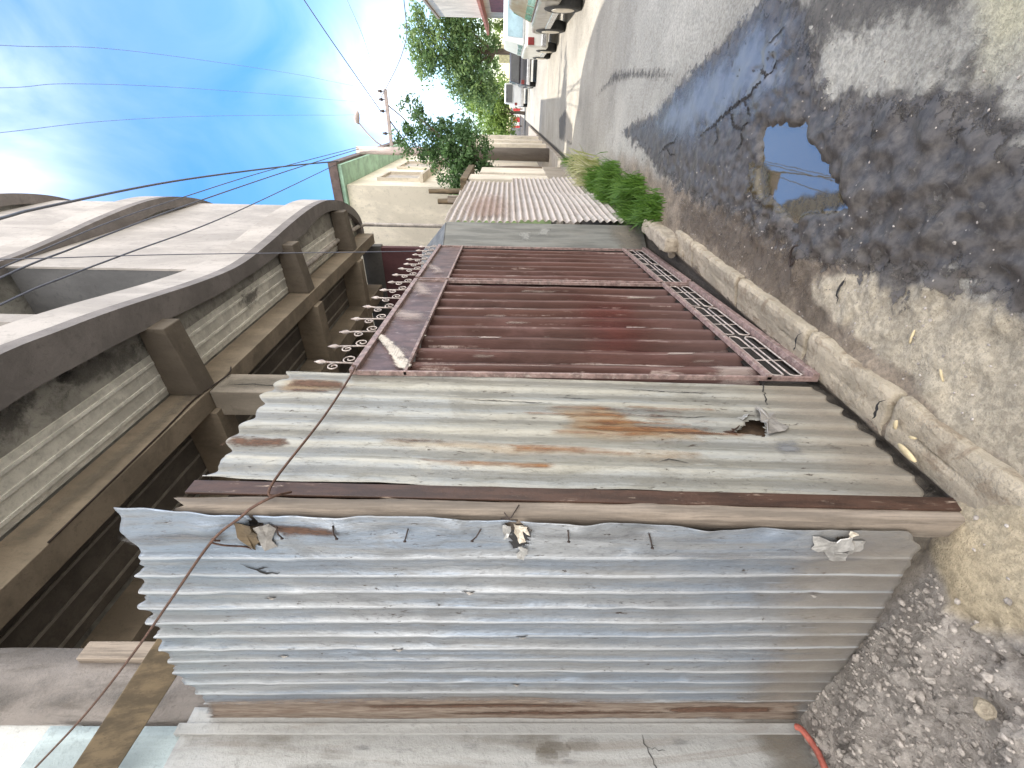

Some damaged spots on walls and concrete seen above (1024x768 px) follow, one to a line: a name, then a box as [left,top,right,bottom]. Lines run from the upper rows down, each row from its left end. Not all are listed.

crack [661,26,784,156]
leakage [601,0,1024,327]
corrosion [578,407,737,435]
peeling [234,523,278,551]
peeling [811,531,866,561]